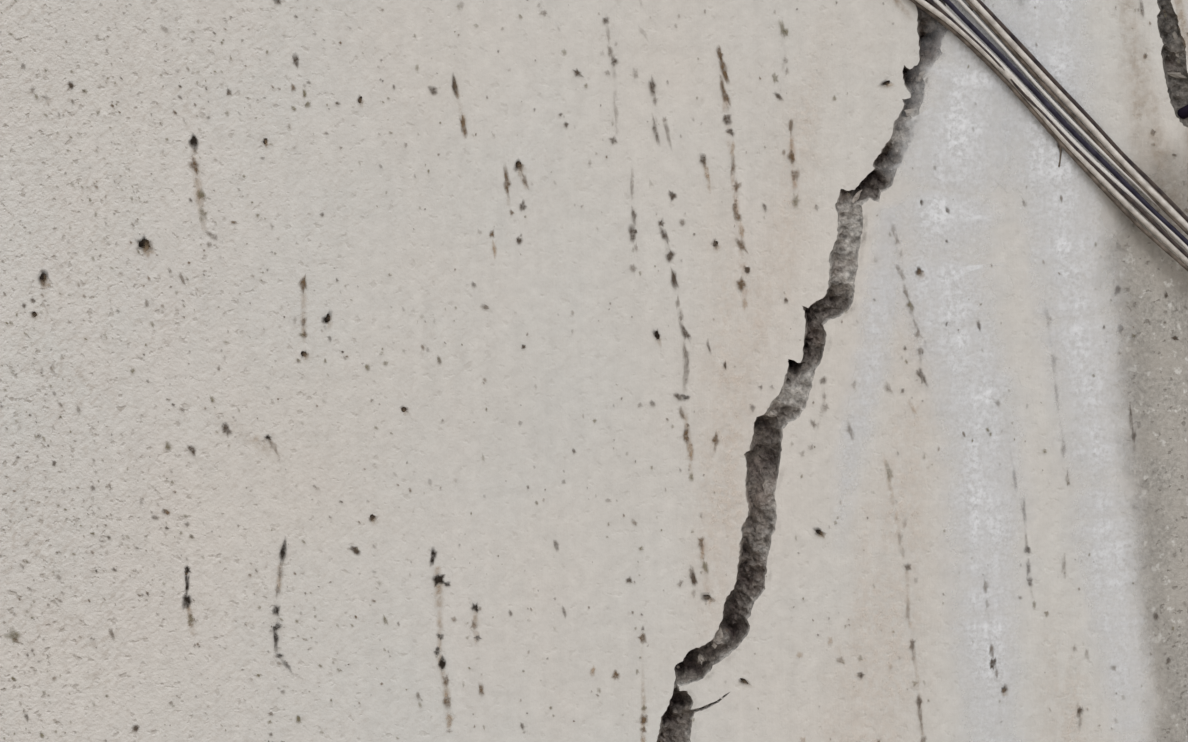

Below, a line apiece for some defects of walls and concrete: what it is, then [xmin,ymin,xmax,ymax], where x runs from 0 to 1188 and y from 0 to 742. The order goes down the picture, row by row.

crack [657,0,949,742]
crack [1157,0,1188,127]